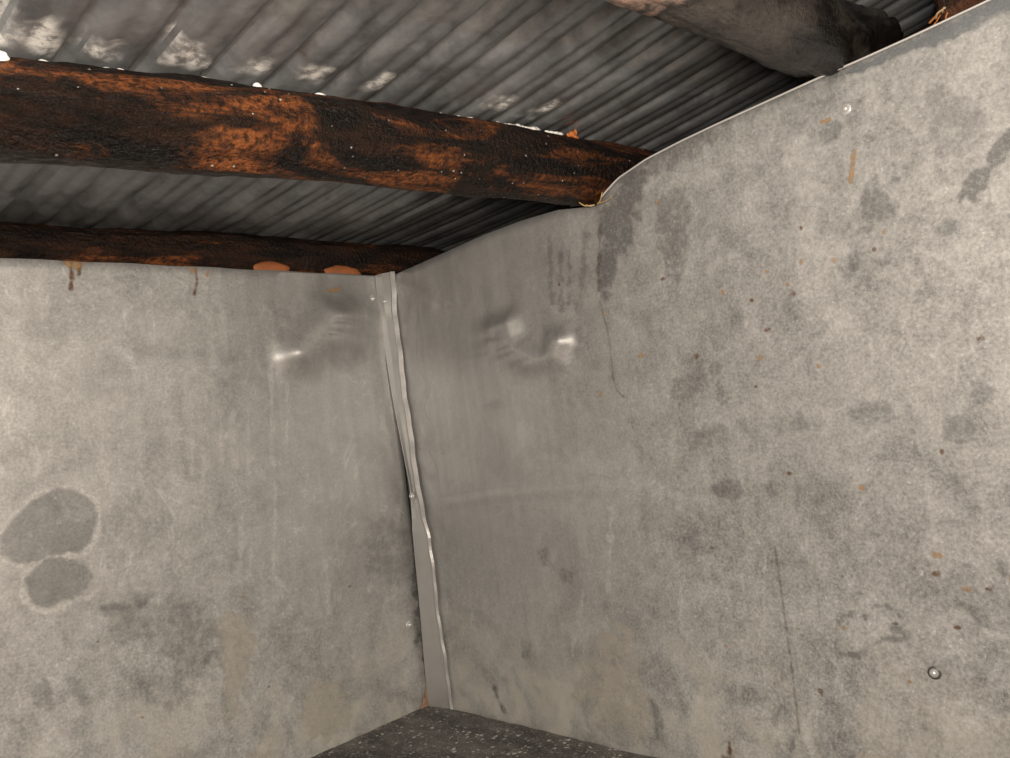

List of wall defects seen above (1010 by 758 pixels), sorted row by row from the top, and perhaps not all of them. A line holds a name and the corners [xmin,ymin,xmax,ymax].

corrosion [65,262,81,290]
water stain [0,484,101,615]